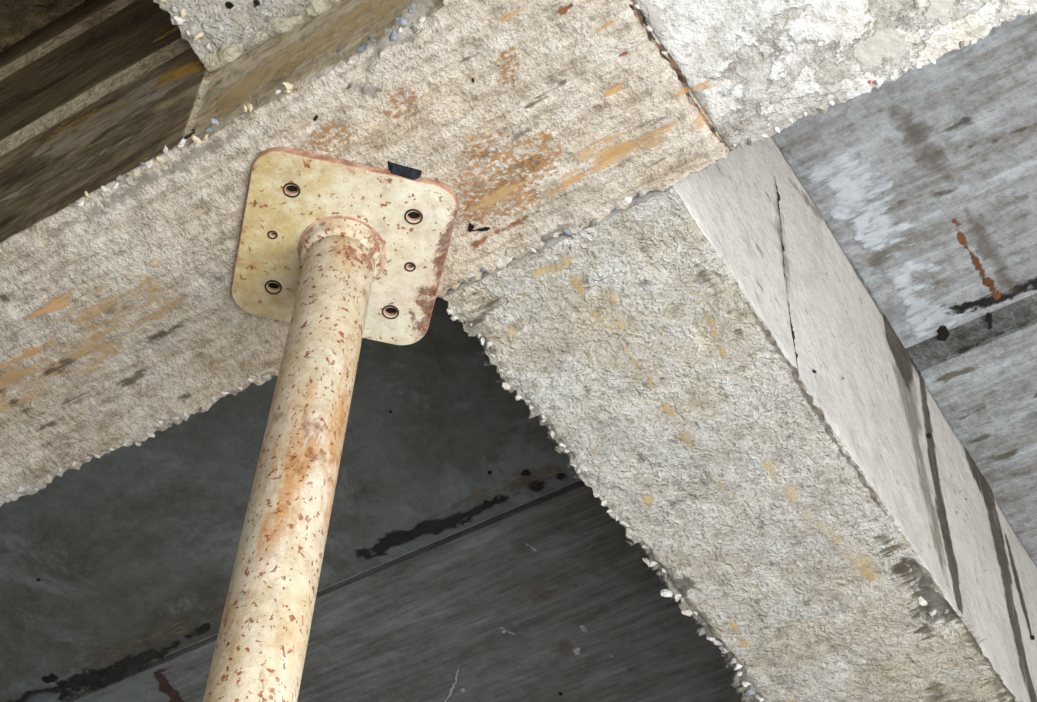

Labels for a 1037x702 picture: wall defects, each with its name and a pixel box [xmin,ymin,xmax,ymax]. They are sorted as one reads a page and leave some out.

water stain [155,60,202,89]
corrosion [385,88,437,119]
corrosion [497,47,520,85]
crack [630,0,729,148]
peeling [732,25,936,147]
peeling [924,0,955,25]
spalling [943,10,1016,50]
corrosion [449,122,675,248]
corrosion [952,219,1008,300]
crack [747,175,888,516]
spalling [0,373,270,501]
corrosion [154,668,184,702]